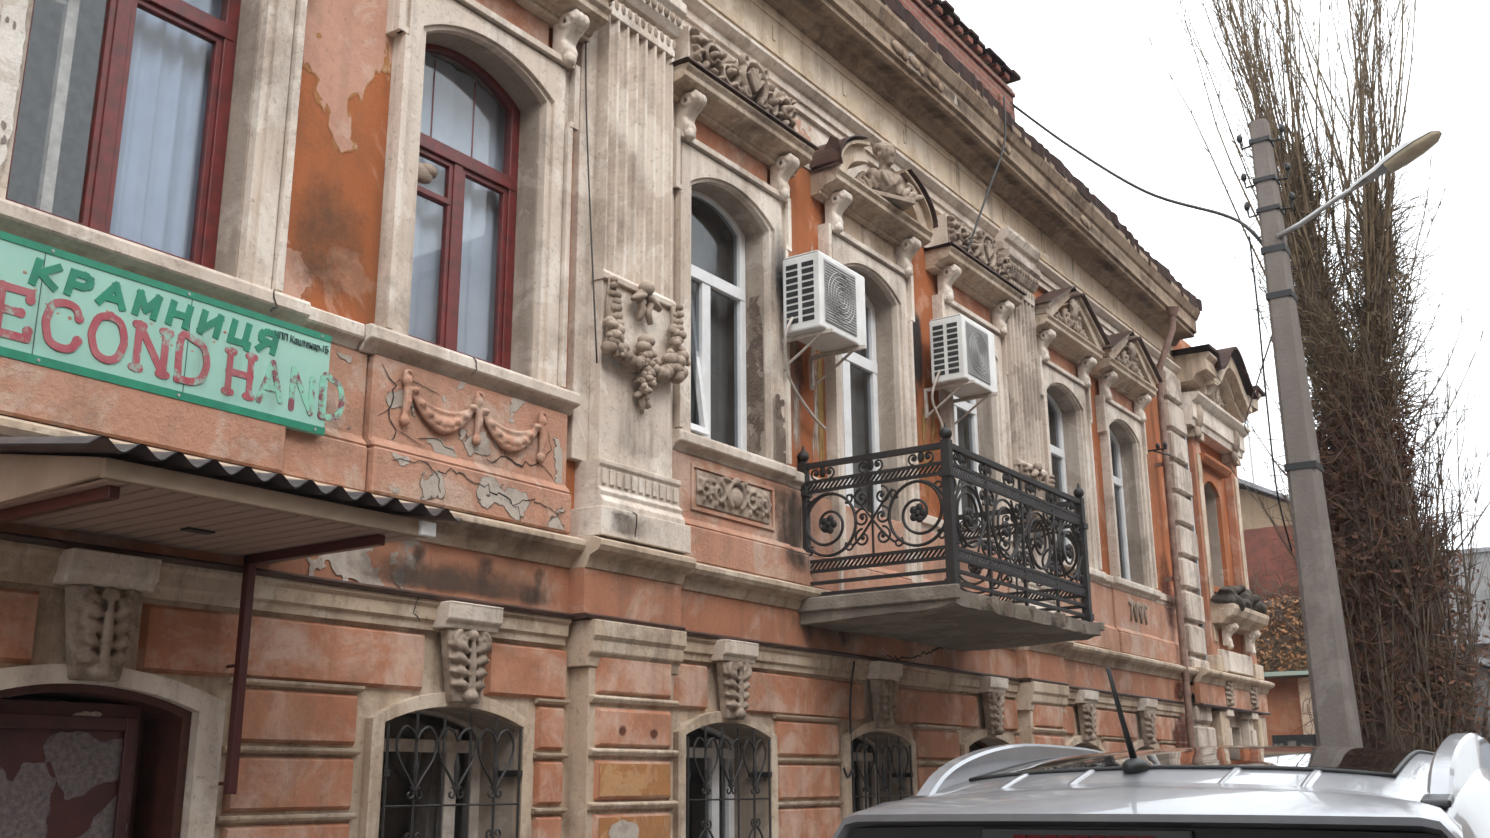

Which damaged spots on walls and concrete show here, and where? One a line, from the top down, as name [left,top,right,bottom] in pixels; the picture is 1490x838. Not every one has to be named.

peeling [302,0,394,154]
spalling [386,386,416,417]
spalling [509,398,526,423]
spalling [392,428,500,500]
crack [378,364,563,517]
spalling [553,437,563,485]
water stain [435,521,535,546]
spalling [476,476,530,521]
spalling [547,506,566,530]
water stain [384,548,541,602]